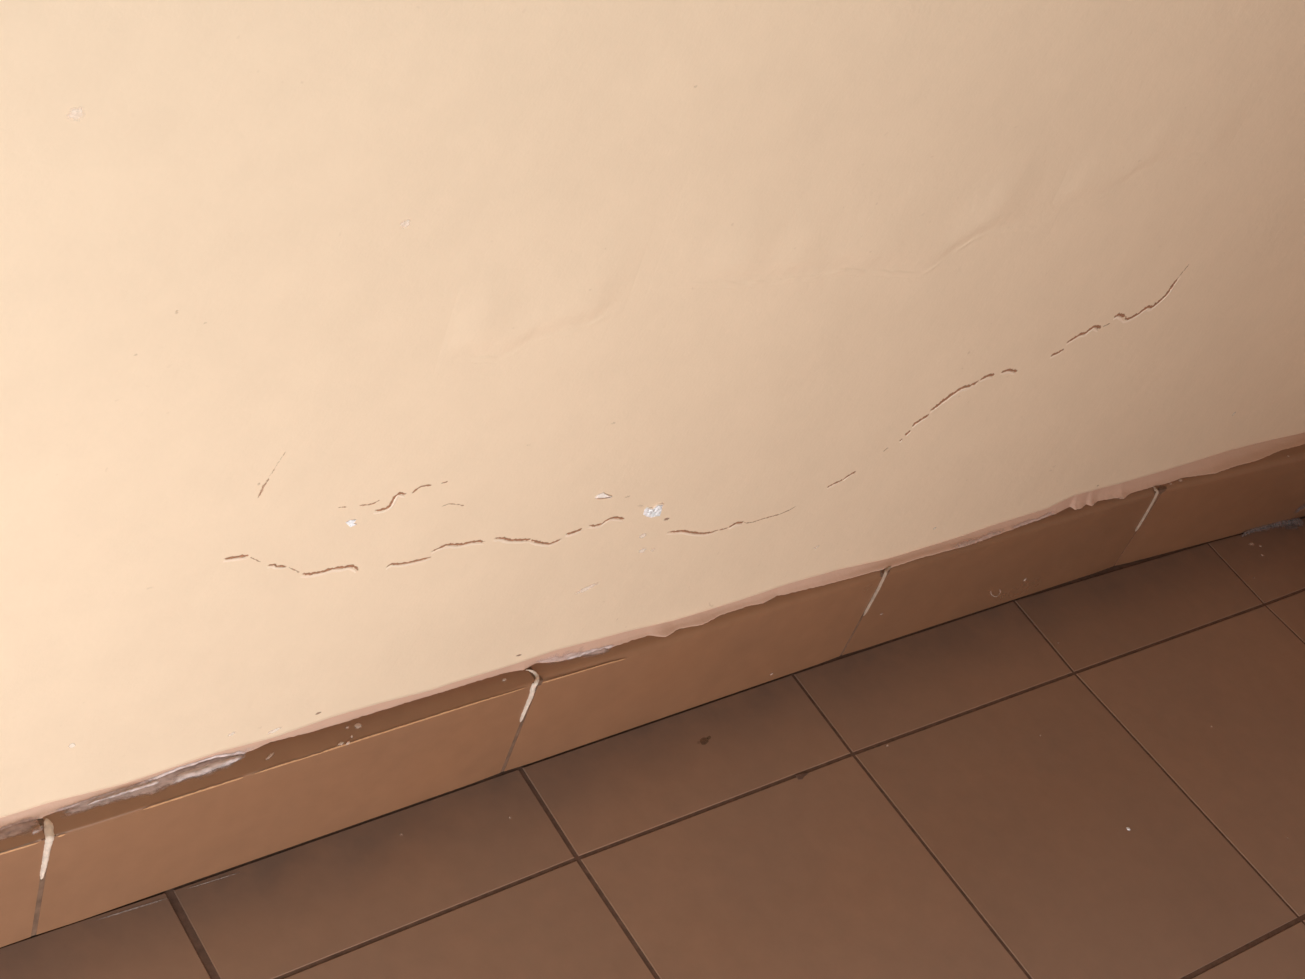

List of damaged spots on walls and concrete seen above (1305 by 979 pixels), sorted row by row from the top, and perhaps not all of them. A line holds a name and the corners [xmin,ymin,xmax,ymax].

crack [1050,267,1187,359]
crack [884,369,1017,451]
crack [339,481,463,514]
crack [223,516,624,578]
crack [666,509,791,537]
crack [827,471,856,489]
peeling [0,433,1305,828]